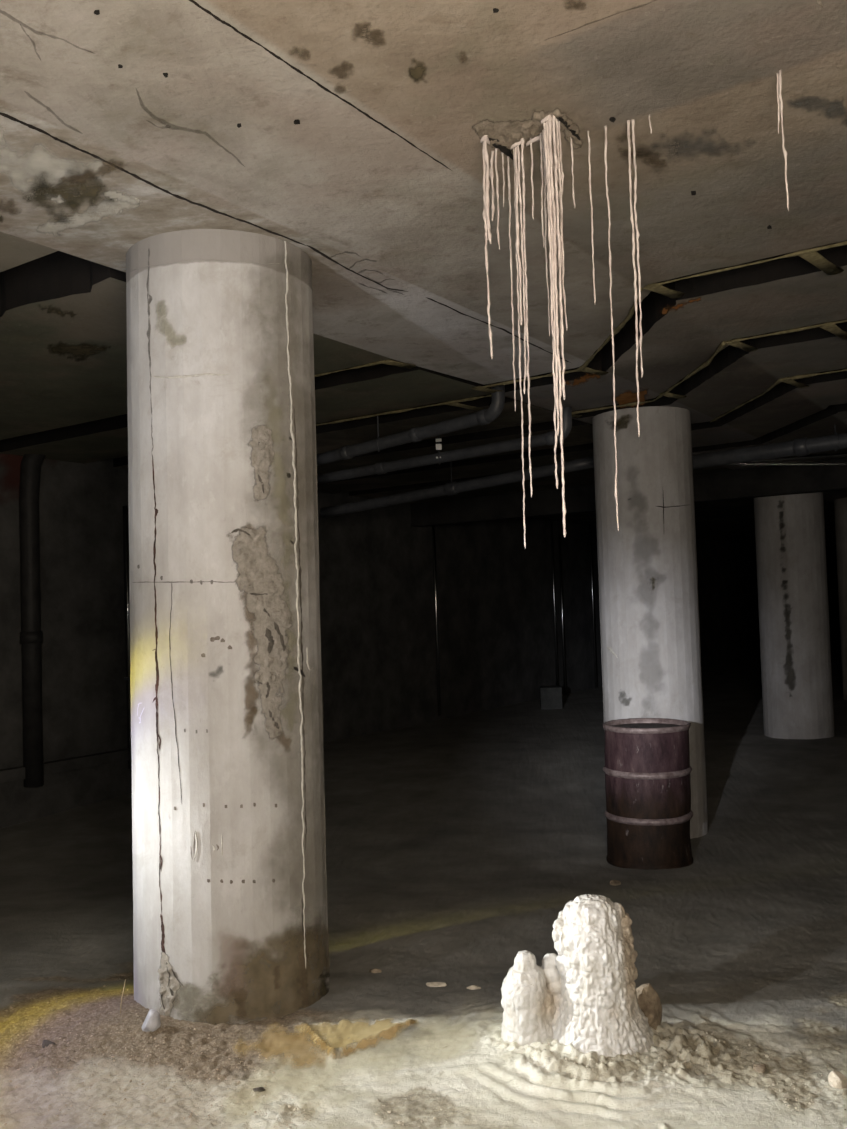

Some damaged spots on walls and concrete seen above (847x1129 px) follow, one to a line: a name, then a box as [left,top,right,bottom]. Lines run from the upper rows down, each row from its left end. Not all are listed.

leakage [0,132,139,236]
crack [0,112,571,363]
crack [189,0,452,171]
spalling [472,109,583,160]
spalling [248,425,275,501]
leakage [265,306,312,518]
crack [146,249,182,954]
leakage [244,592,258,731]
spalling [228,526,292,739]
leakage [782,568,796,696]
leakage [175,630,330,1025]
spalling [158,952,184,1017]